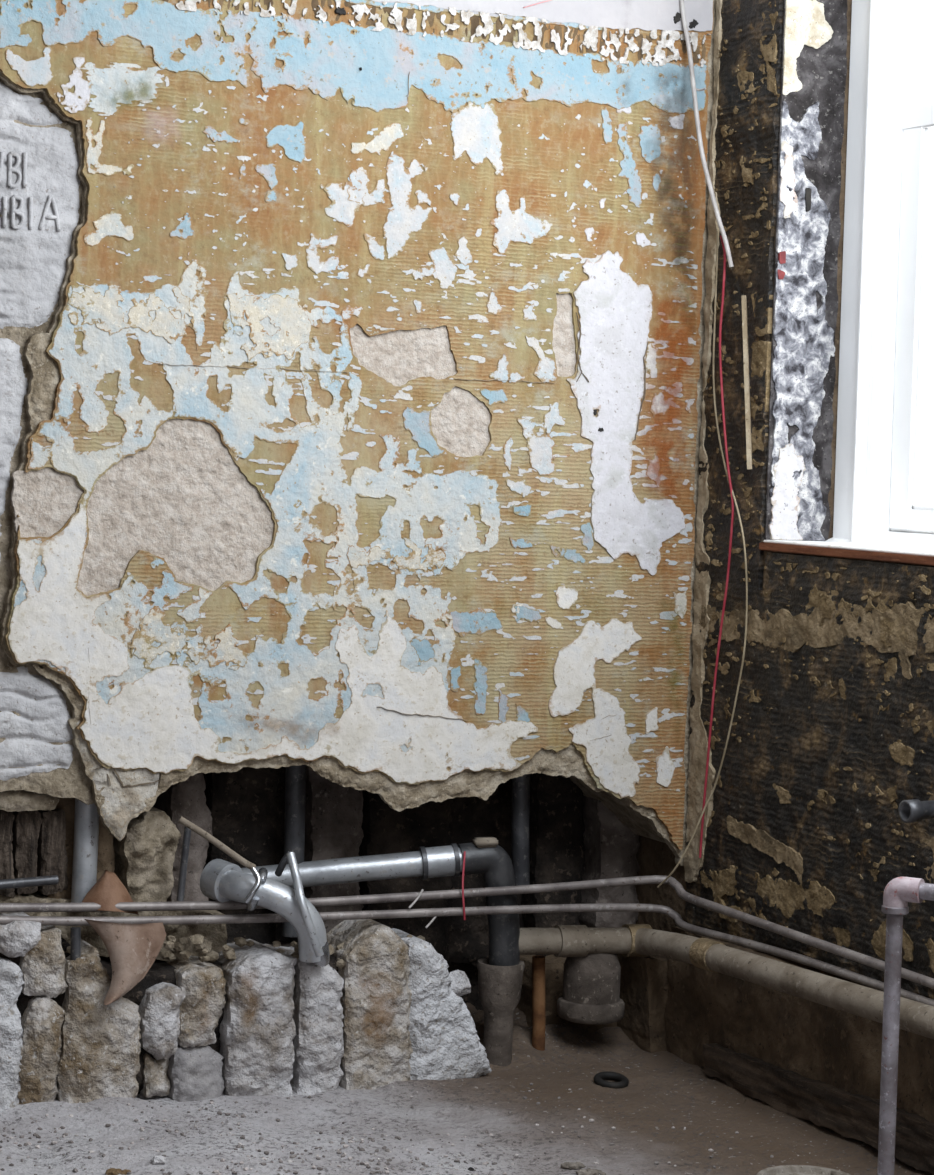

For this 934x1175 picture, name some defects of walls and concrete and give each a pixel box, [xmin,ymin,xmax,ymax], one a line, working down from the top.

peeling [0,0,934,923]